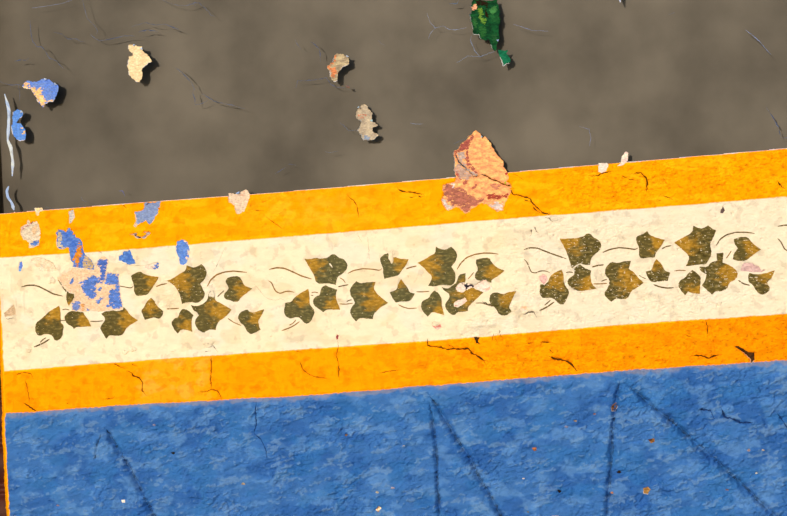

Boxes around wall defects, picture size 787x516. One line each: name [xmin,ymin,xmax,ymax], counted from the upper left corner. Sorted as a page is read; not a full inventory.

flaking render [469,0,511,66]
peeling [127,44,152,82]
peeling [327,54,350,88]
peeling [22,78,58,107]
peeling [11,109,26,141]
flaking render [356,104,378,140]
peeling [441,130,512,213]
peeling [20,208,43,248]
peeling [130,201,161,239]
peeling [228,189,250,214]
peeling [56,210,123,312]
peeling [175,240,190,265]